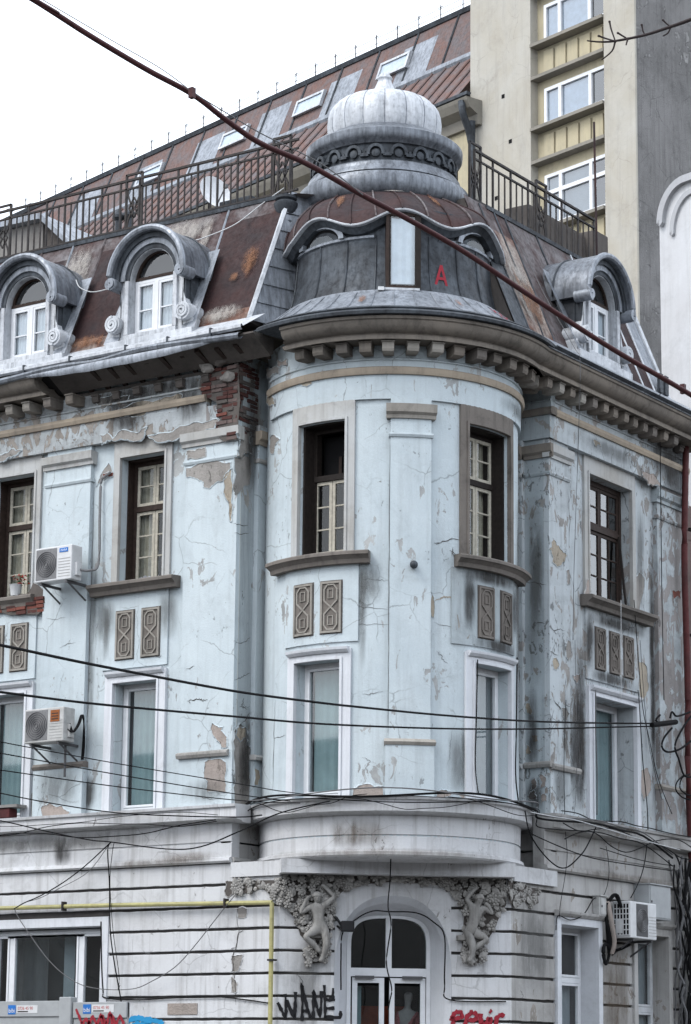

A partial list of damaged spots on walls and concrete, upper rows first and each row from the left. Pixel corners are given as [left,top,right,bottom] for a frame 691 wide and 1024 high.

peeling [0,448,23,463]
flaking render [96,358,288,523]
peeling [641,468,660,487]
crack [360,469,390,695]
peeling [549,537,571,586]
spalling [203,722,261,805]
peeling [641,767,652,801]